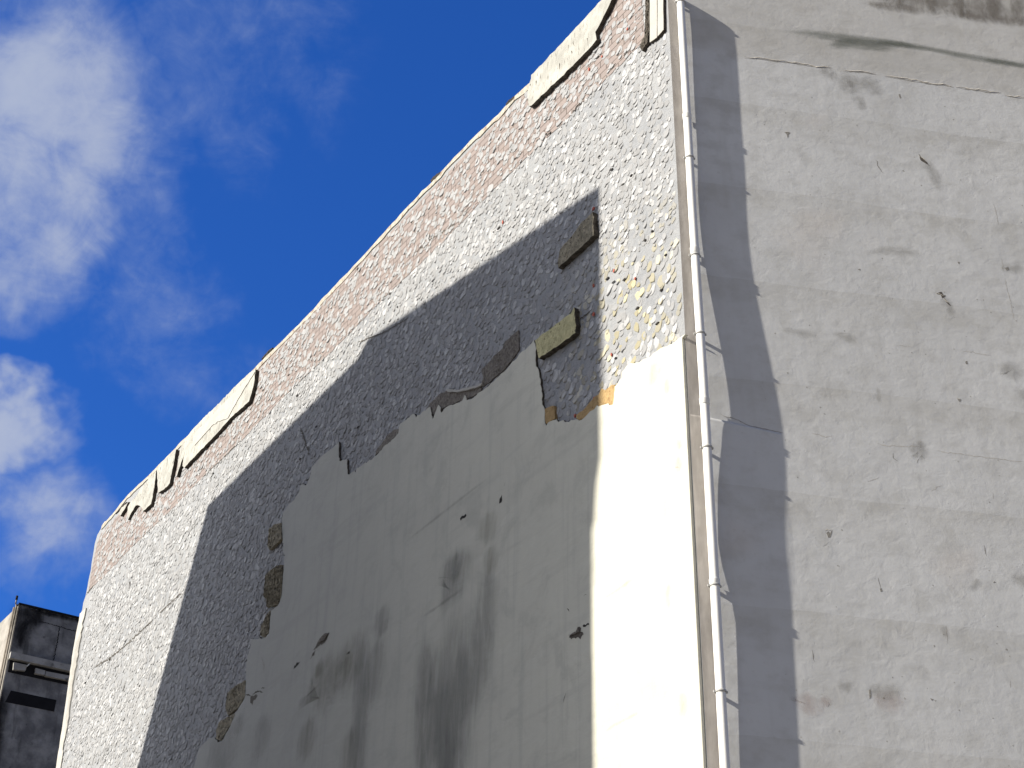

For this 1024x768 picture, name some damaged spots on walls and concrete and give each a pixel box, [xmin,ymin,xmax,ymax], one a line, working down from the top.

peeling [61,0,682,768]
crack [747,57,1024,99]